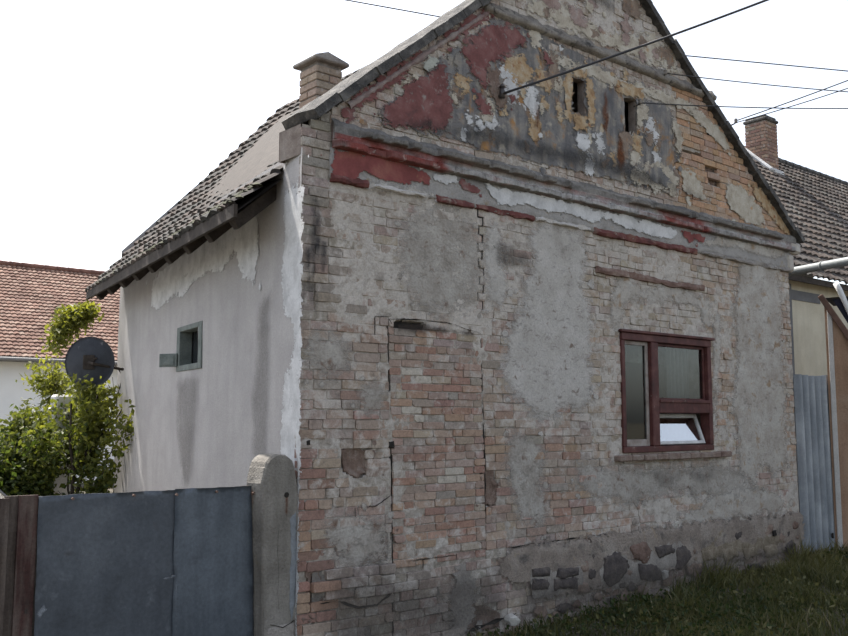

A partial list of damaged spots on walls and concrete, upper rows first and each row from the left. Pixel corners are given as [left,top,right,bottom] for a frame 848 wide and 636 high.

flaking render [341,0,731,206]
flaking render [331,148,790,261]
flaking render [146,214,261,313]
hole [393,320,423,330]
flaking render [266,183,324,636]
spalling [341,438,376,478]
spalling [476,470,501,508]